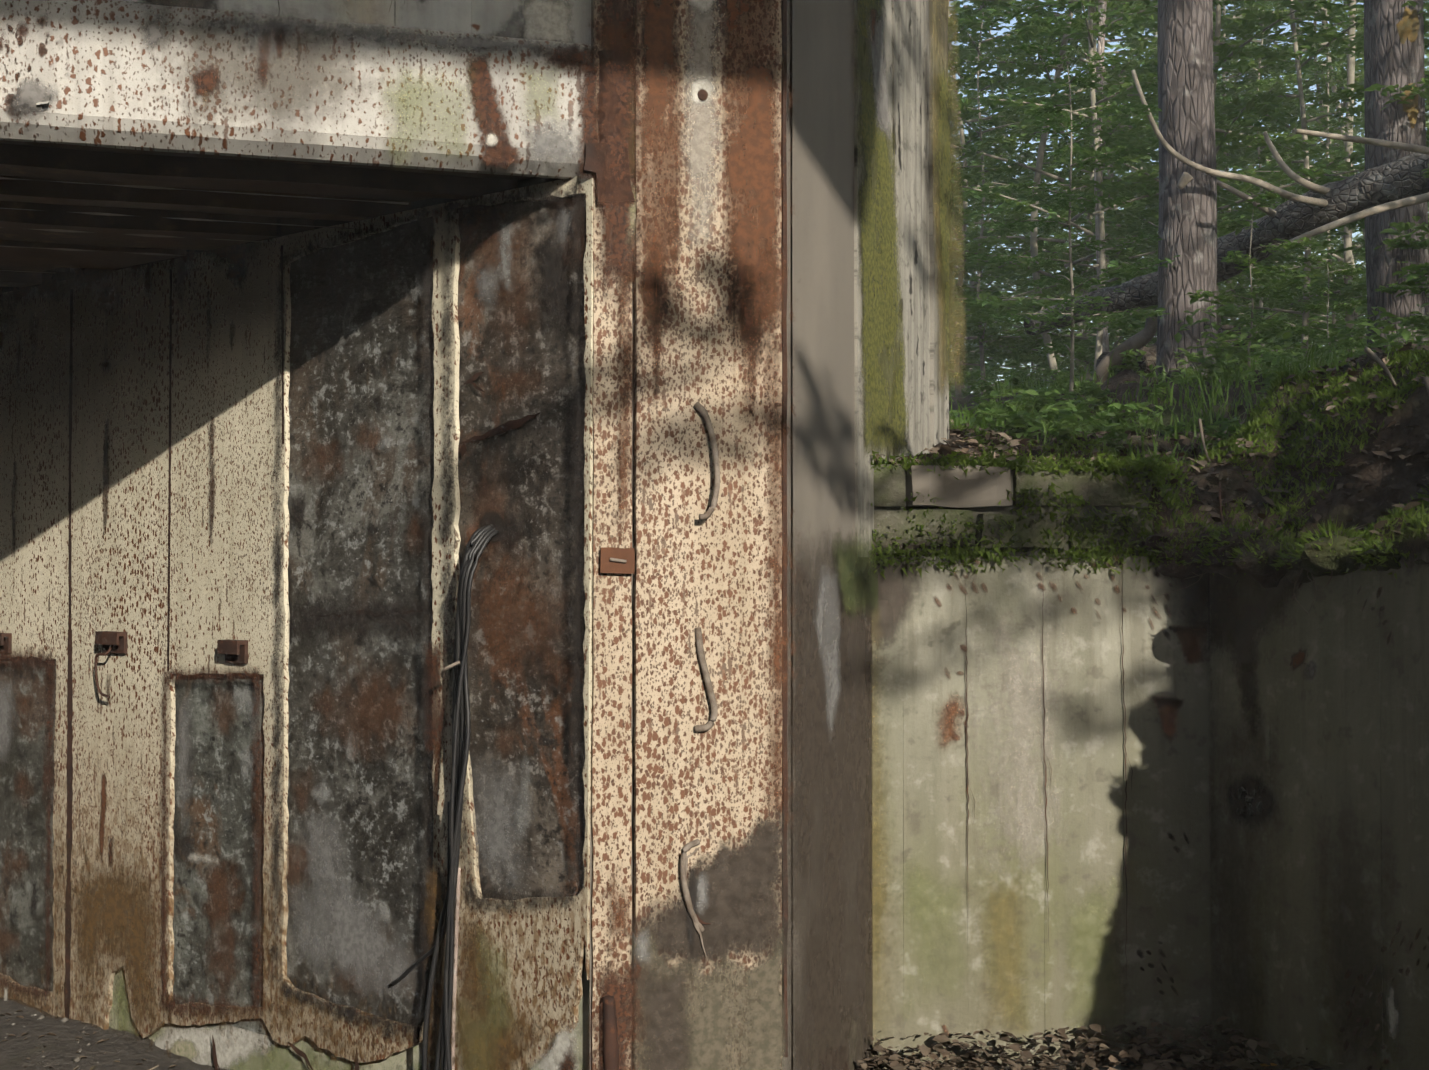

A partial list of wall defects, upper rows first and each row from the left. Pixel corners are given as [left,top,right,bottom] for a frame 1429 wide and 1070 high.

rust [0,0,689,1070]
leakage [640,540,923,1070]
rust [940,698,968,746]
leakage [1181,571,1299,738]